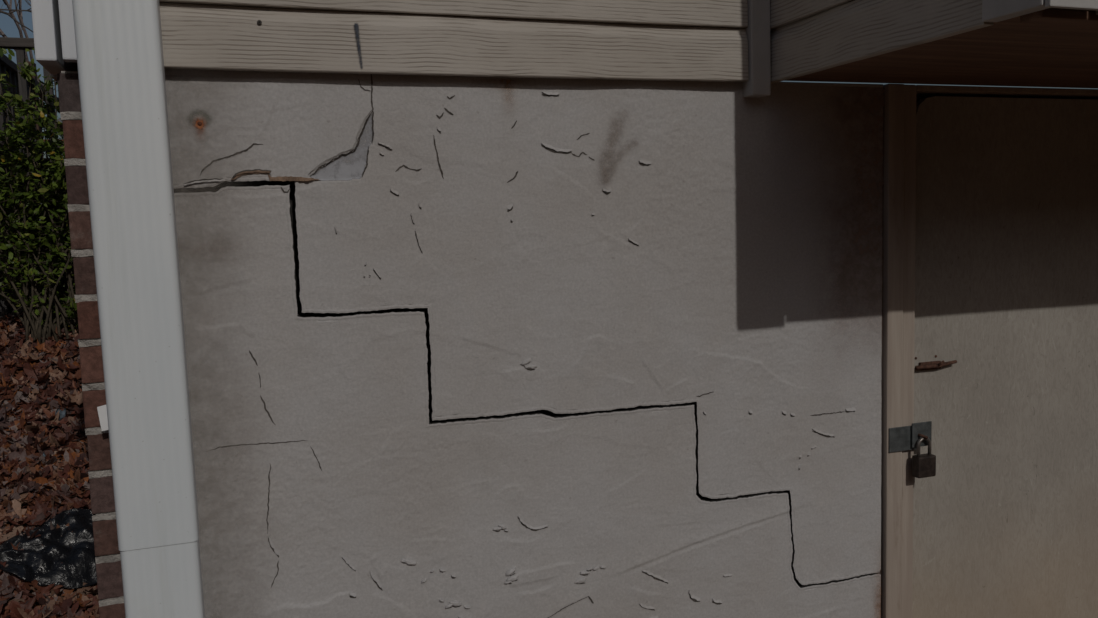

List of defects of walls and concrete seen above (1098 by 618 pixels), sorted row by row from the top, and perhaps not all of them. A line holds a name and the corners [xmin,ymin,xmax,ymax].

spalling [184,74,392,193]
crack [173,143,880,591]